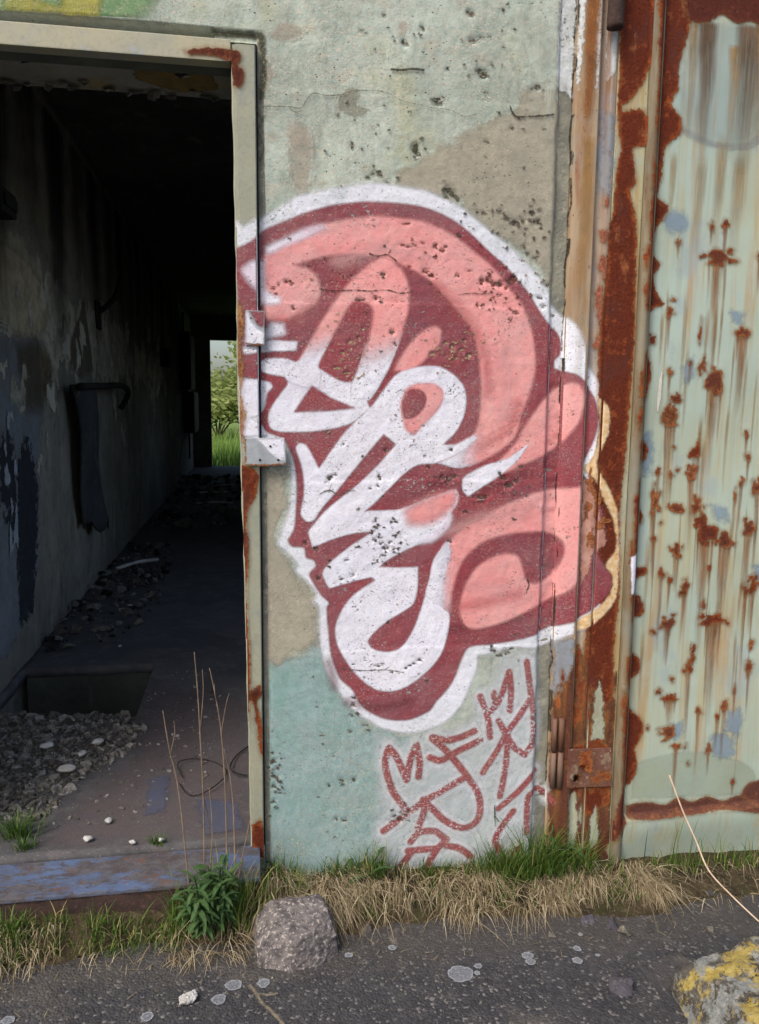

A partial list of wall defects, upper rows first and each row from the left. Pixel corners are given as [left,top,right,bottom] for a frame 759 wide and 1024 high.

rust [183,46,244,87]
peeling [366,57,577,343]
rust [237,301,286,756]
rust [546,0,759,861]
spalling [545,583,556,781]
rust [251,820,264,858]